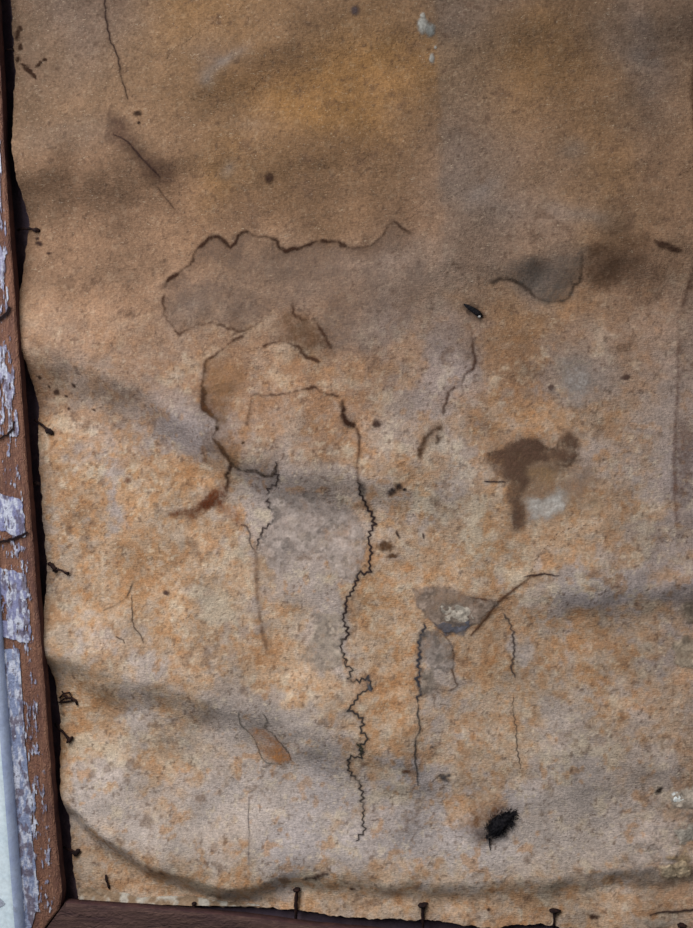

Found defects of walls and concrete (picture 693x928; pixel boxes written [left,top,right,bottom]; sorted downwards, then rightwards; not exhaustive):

crack [104,0,128,99]
crack [114,134,173,207]
rust [173,490,223,518]
water stain [492,434,592,528]
crack [339,482,377,841]
crack [414,624,458,785]
peeling [412,586,497,694]
crack [471,573,559,764]